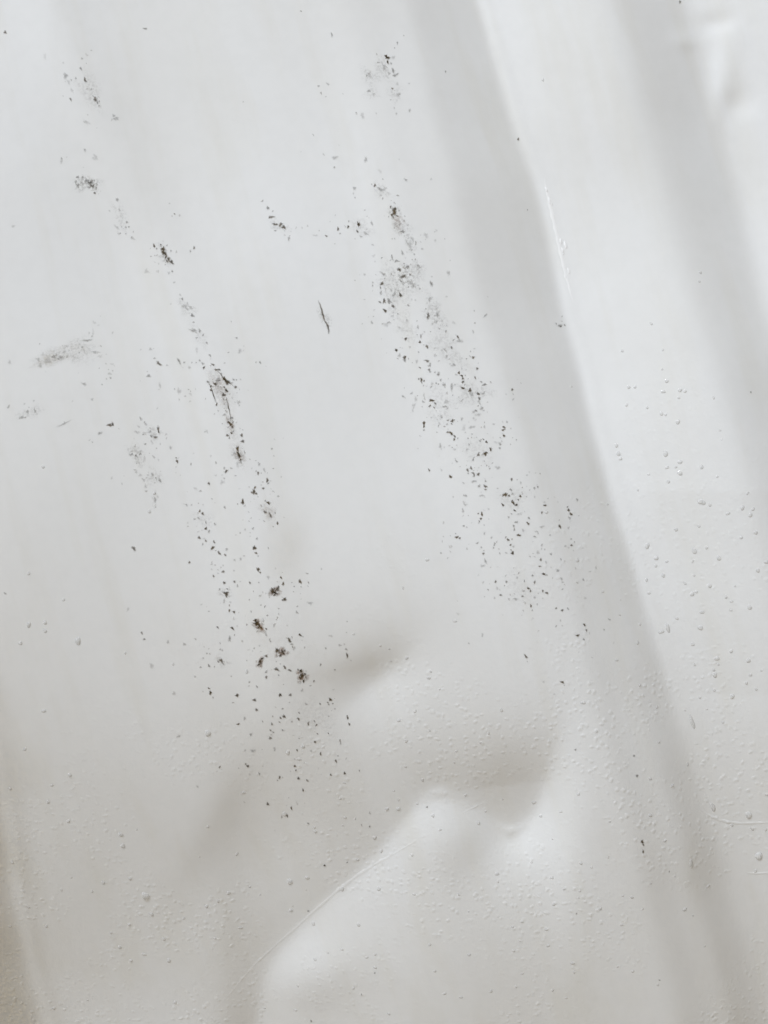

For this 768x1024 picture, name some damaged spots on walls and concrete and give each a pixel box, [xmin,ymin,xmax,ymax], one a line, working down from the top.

water stain [258,634,314,683]